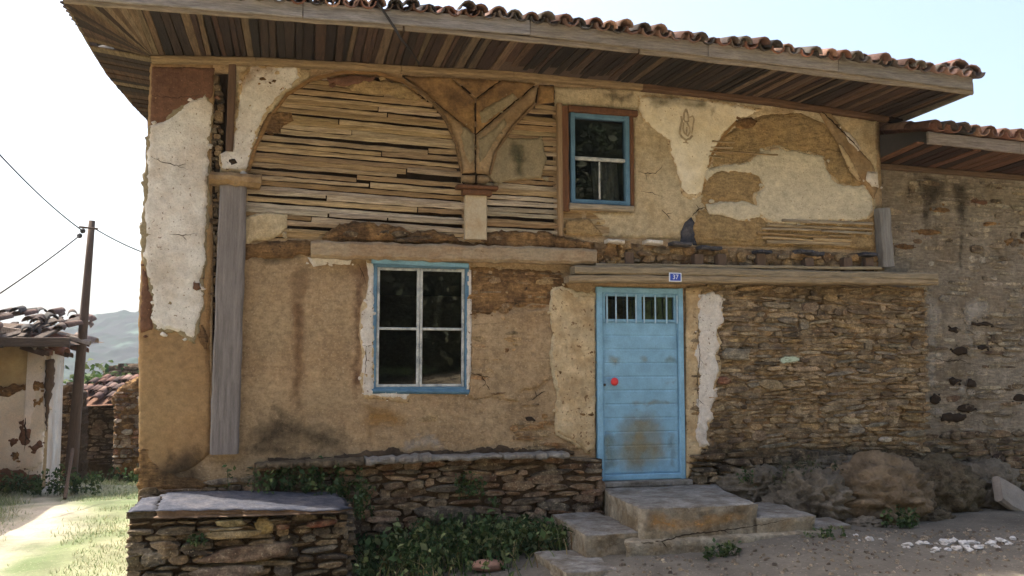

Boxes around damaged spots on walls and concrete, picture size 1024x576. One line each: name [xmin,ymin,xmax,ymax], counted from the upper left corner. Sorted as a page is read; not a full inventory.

peeling [139,66,301,351]
peeling [635,94,883,246]
peeling [0,381,52,491]
peeling [466,267,596,454]
peeling [685,287,725,478]